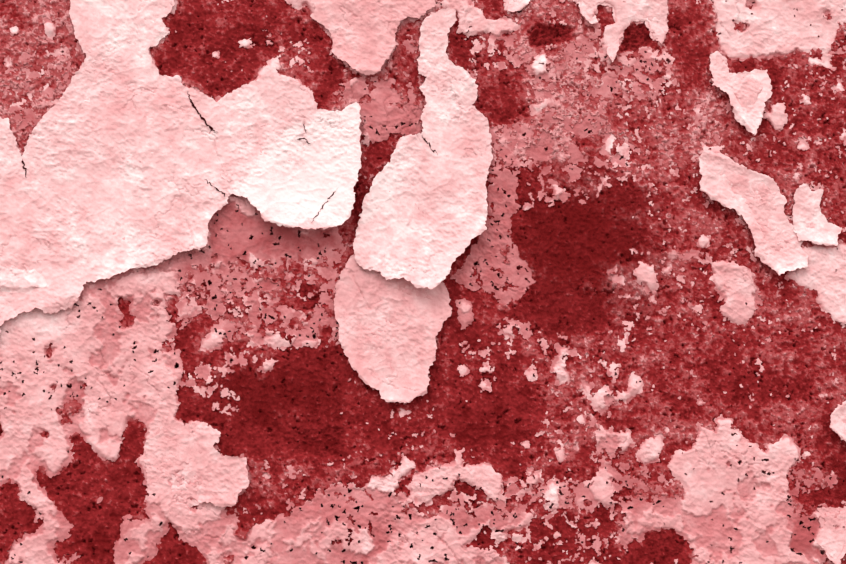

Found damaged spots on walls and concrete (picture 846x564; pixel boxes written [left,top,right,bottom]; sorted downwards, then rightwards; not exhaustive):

peeling [606,19,665,70]
peeling [709,51,772,136]
peeling [310,0,506,290]
peeling [0,0,452,403]
peeling [698,148,814,276]
peeling [792,183,842,247]
peeling [56,397,82,425]
peeling [0,478,44,564]
peeling [36,418,249,564]
peeling [332,514,355,546]
peeling [401,479,501,518]
peeling [575,533,601,557]